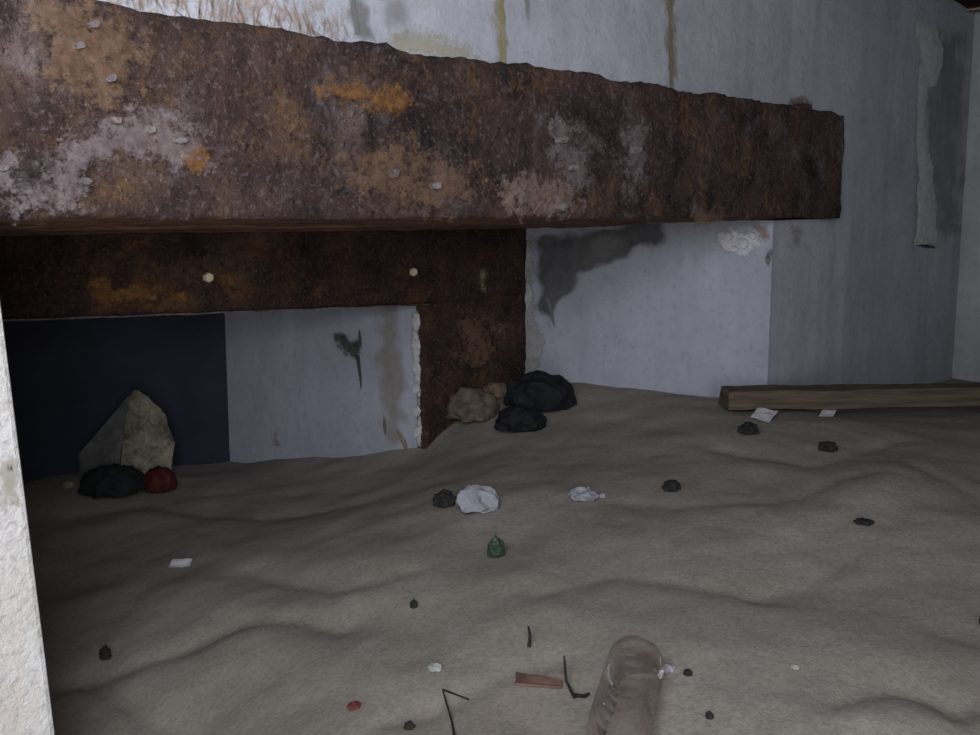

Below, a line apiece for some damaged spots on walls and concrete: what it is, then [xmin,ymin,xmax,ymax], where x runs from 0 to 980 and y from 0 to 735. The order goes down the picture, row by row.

rust [135,0,351,42]
water stain [350,0,370,36]
rust [495,0,507,63]
rust [666,0,676,88]
rust [0,0,216,216]
rust [314,75,412,115]
rust [352,147,472,215]
rust [485,112,592,218]
rust [620,117,648,195]
water stain [537,222,663,325]
spalling [715,226,771,264]
mould [334,330,362,388]